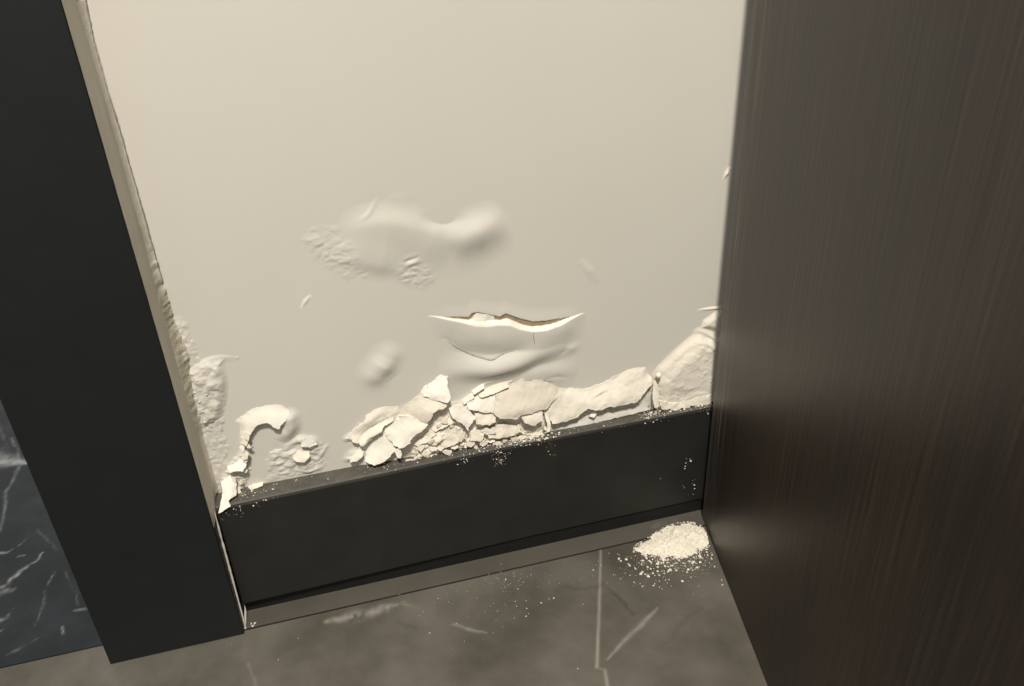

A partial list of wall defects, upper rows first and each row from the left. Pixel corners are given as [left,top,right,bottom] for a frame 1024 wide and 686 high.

peeling [173,315,201,368]
crack [426,299,584,344]
peeling [202,405,317,513]
spalling [341,367,662,466]